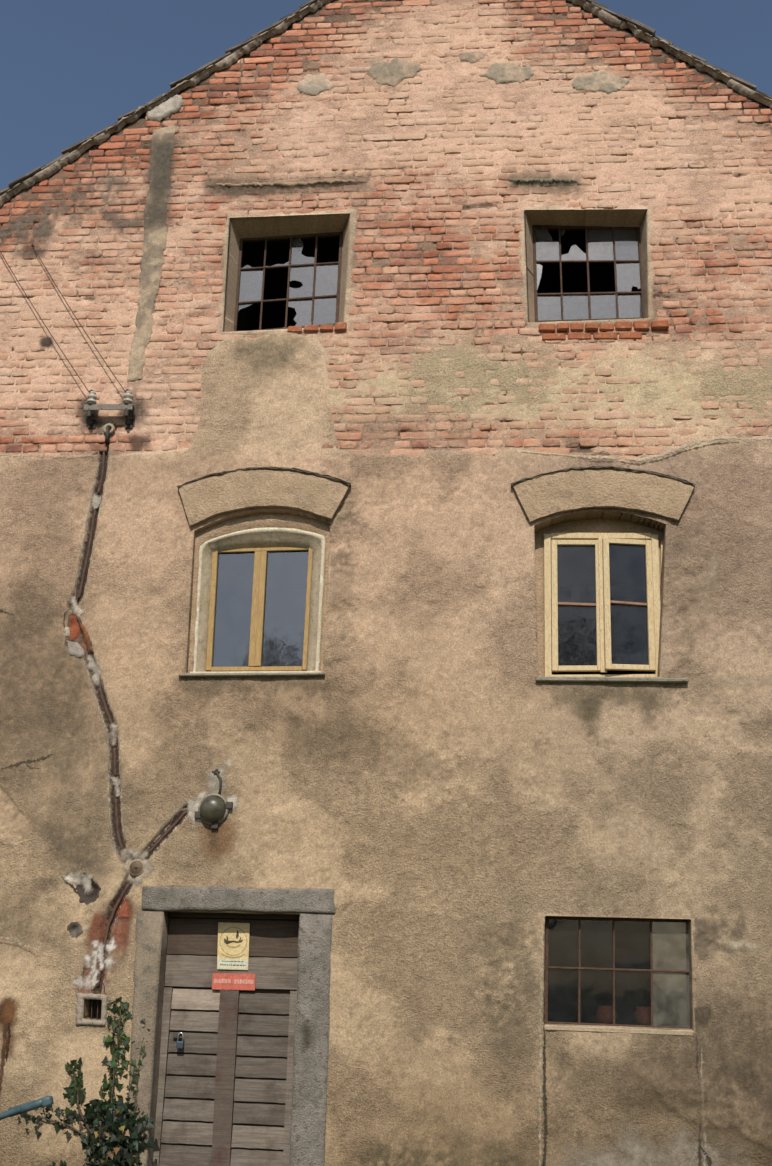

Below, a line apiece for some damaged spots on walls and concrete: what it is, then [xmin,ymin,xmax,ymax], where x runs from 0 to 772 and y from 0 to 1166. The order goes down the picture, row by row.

flaking render [64,610,94,658]
peeling [61,872,131,994]
corrosion [0,998,16,1092]
crack [538,930,548,1166]
crack [696,1035,711,1166]